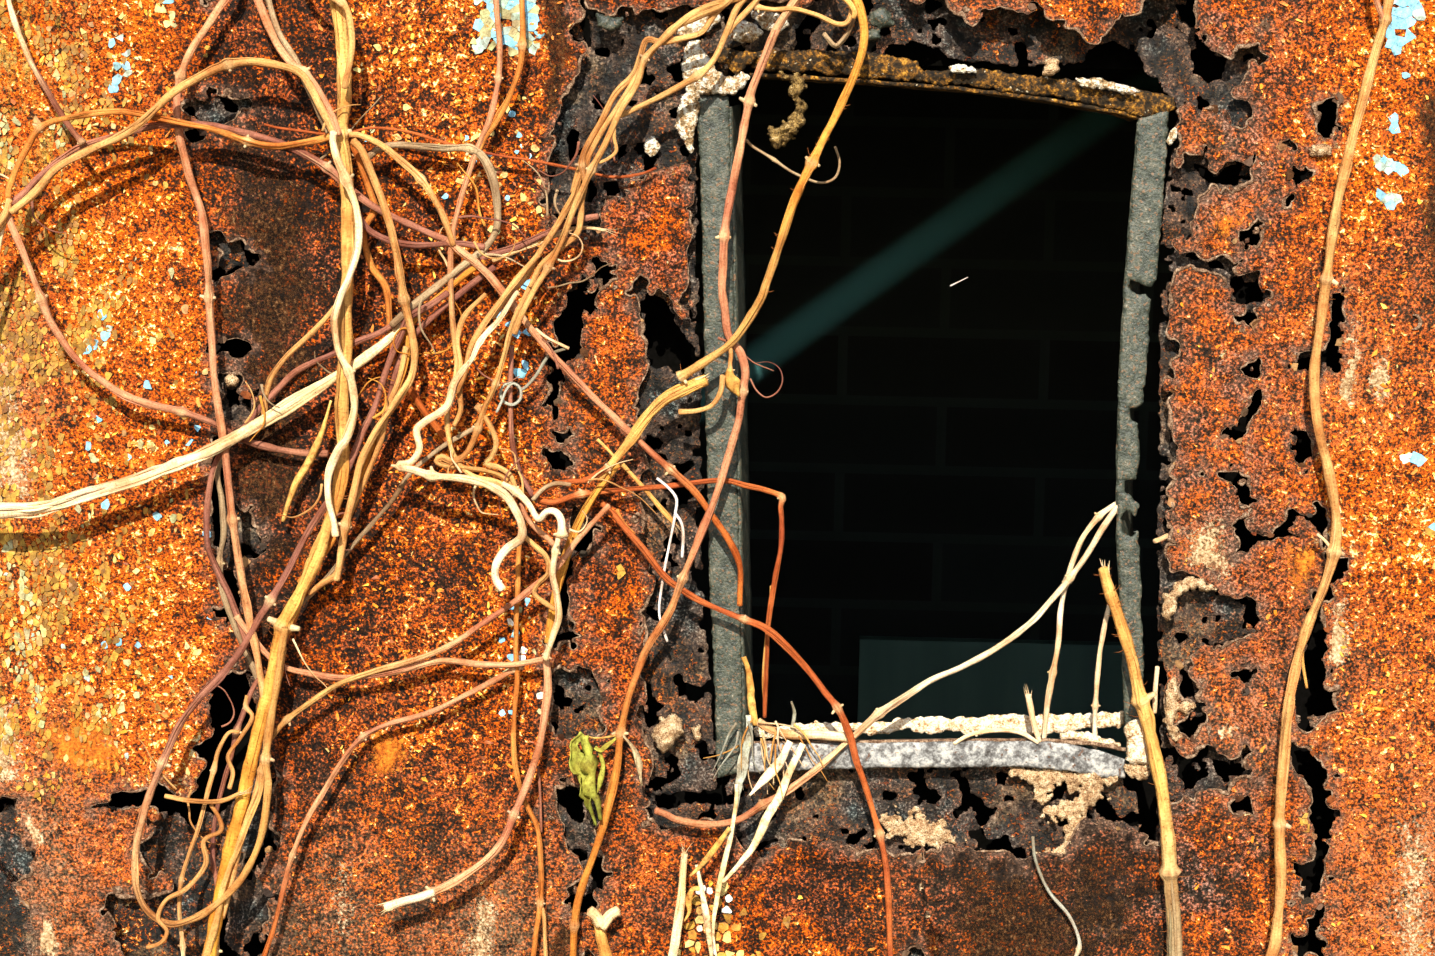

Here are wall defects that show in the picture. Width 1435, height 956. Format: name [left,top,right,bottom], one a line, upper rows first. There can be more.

peeling [353,0,561,142]
rust [541,0,573,115]
peeling [1382,0,1426,58]
rust [216,139,327,520]
peeling [408,338,488,464]
rust [1327,322,1390,405]
peeling [1348,299,1435,569]
peeling [336,517,543,695]
rust [1187,519,1234,580]
rust [1323,598,1356,666]
peeling [1333,617,1435,829]
rust [1394,824,1433,956]